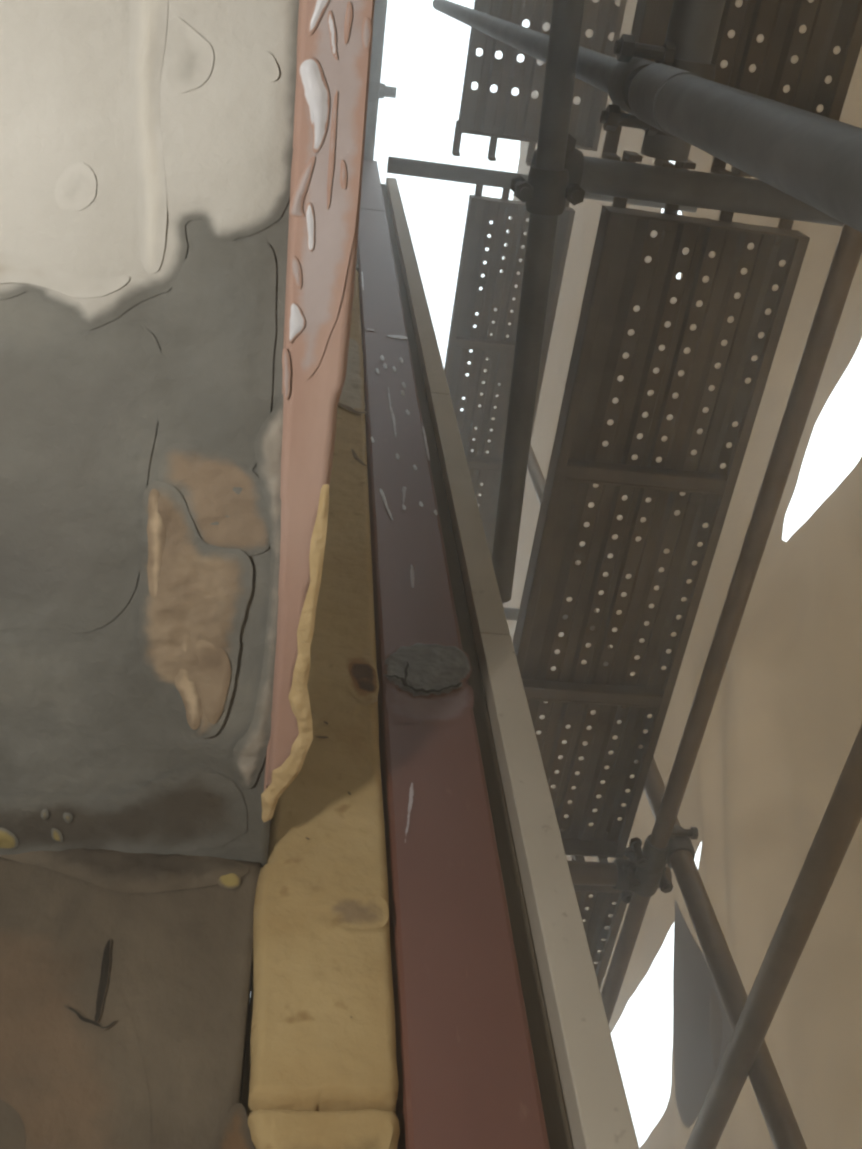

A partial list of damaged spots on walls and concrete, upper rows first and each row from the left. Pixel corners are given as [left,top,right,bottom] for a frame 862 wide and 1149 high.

flaking render [0,0,373,400]
spalling [138,443,270,738]
crack [64,939,117,1030]